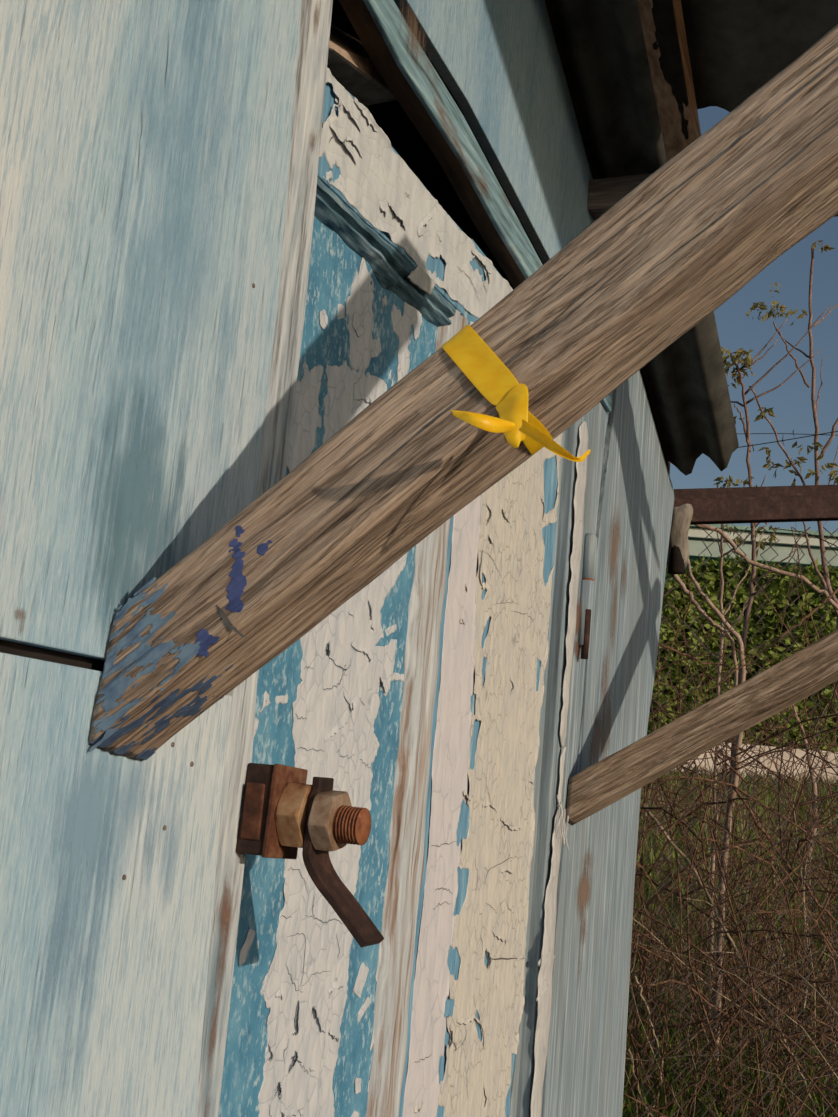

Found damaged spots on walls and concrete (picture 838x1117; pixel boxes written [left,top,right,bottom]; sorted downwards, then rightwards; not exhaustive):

peeling [319,68,513,326]
peeling [287,257,422,473]
peeling [239,929,255,966]
crack [265,867,343,1117]
peeling [258,844,378,1117]
peeling [254,552,408,811]
crack [296,599,387,768]
crack [414,1014,502,1115]
crack [462,786,526,968]
peeling [402,421,589,1117]